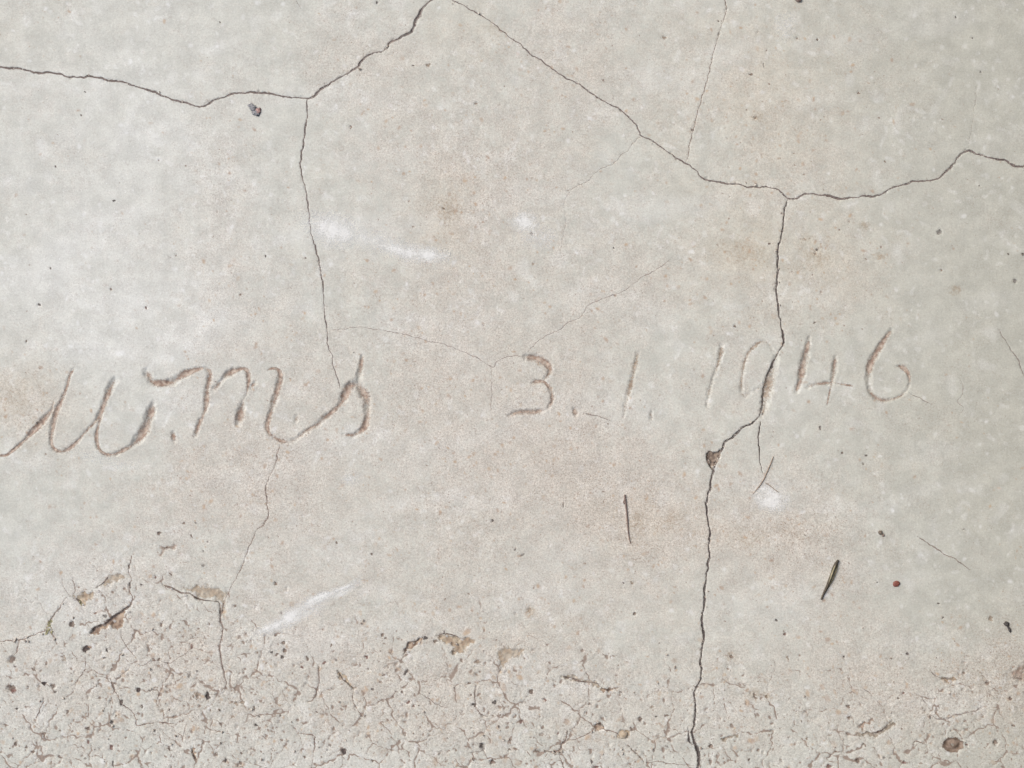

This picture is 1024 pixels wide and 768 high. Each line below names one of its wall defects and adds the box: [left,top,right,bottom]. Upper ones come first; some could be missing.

crack [0,0,518,406]
crack [452,0,1024,768]
crack [0,581,75,655]
spalling [73,565,142,652]
crack [76,449,279,737]
spalling [155,573,236,615]
spalling [404,631,474,655]
spalling [498,647,524,673]
spalling [564,675,622,694]
spalling [857,719,903,747]
spalling [942,730,968,753]